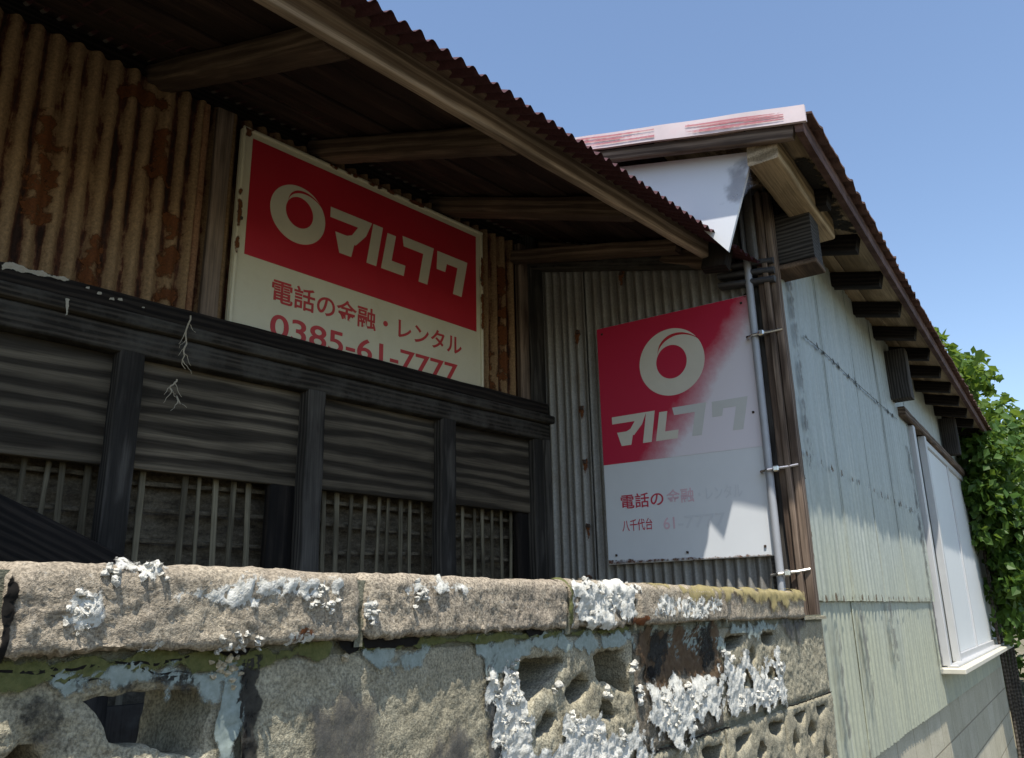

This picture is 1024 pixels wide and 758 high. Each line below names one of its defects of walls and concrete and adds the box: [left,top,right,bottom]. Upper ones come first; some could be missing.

rust [18,107,69,226]
rust [151,211,184,306]
water stain [62,557,170,637]
water stain [174,571,344,615]
water stain [284,631,314,646]
water stain [571,576,642,630]
water stain [655,594,722,620]
water stain [152,668,200,693]
water stain [214,630,264,758]
water stain [484,645,788,758]